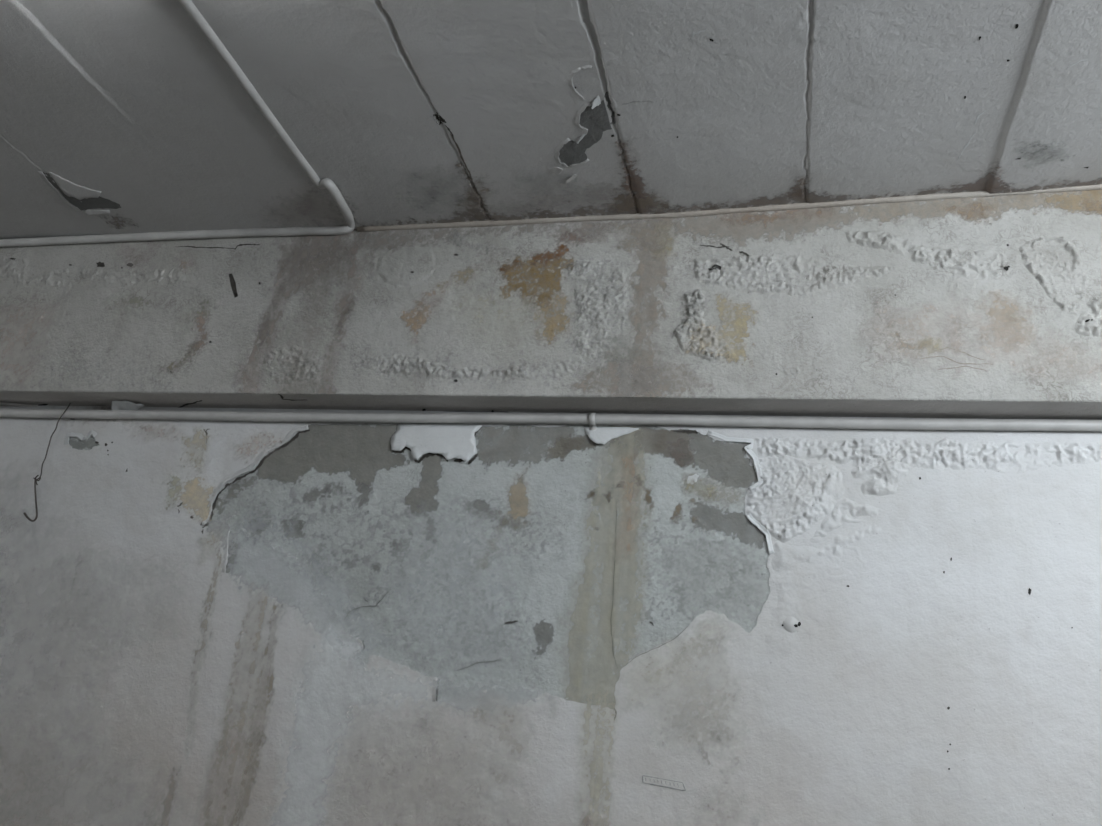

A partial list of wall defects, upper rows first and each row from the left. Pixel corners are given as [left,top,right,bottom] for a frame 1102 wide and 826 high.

peeling [37,171,121,215]
peeling [549,65,620,183]
leakage [239,163,1102,398]
peeling [200,409,774,711]
leakage [566,426,646,826]